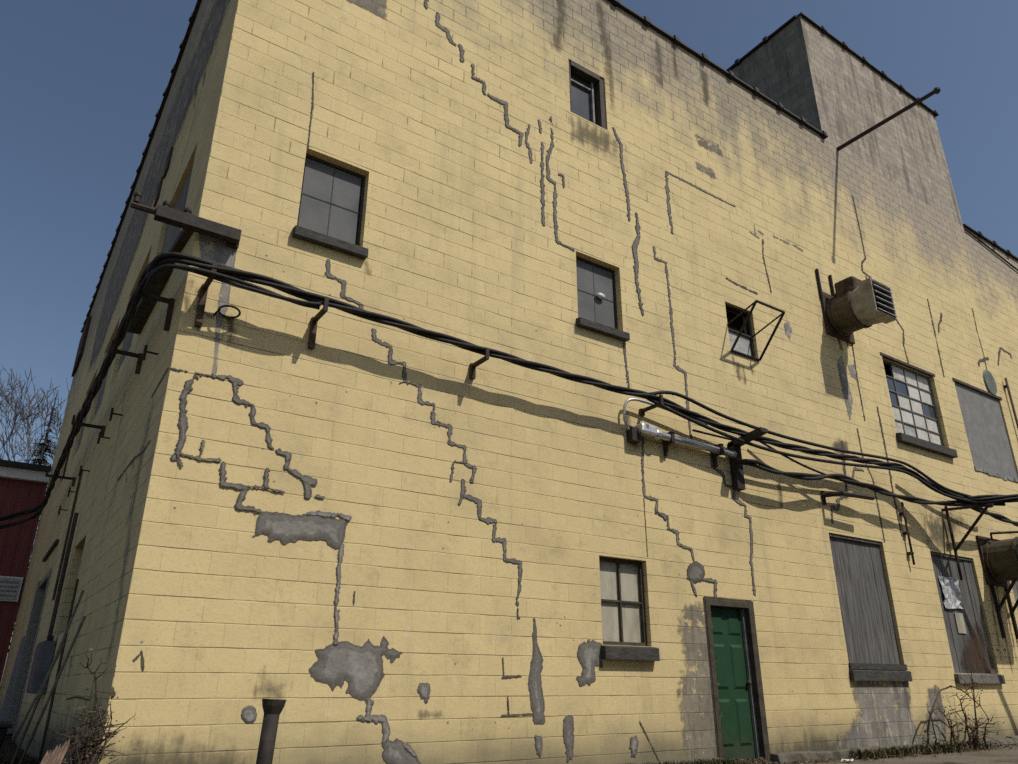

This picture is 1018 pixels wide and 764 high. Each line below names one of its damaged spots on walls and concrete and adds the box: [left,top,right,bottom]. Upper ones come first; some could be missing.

spalling [347,0,387,19]
crack [424,0,575,251]
crack [612,127,756,597]
crack [106,393,150,498]
crack [151,368,325,514]
crack [325,259,523,620]
spalling [253,510,421,764]
spalling [528,618,545,758]
spalling [563,715,574,762]
spalling [577,639,603,686]